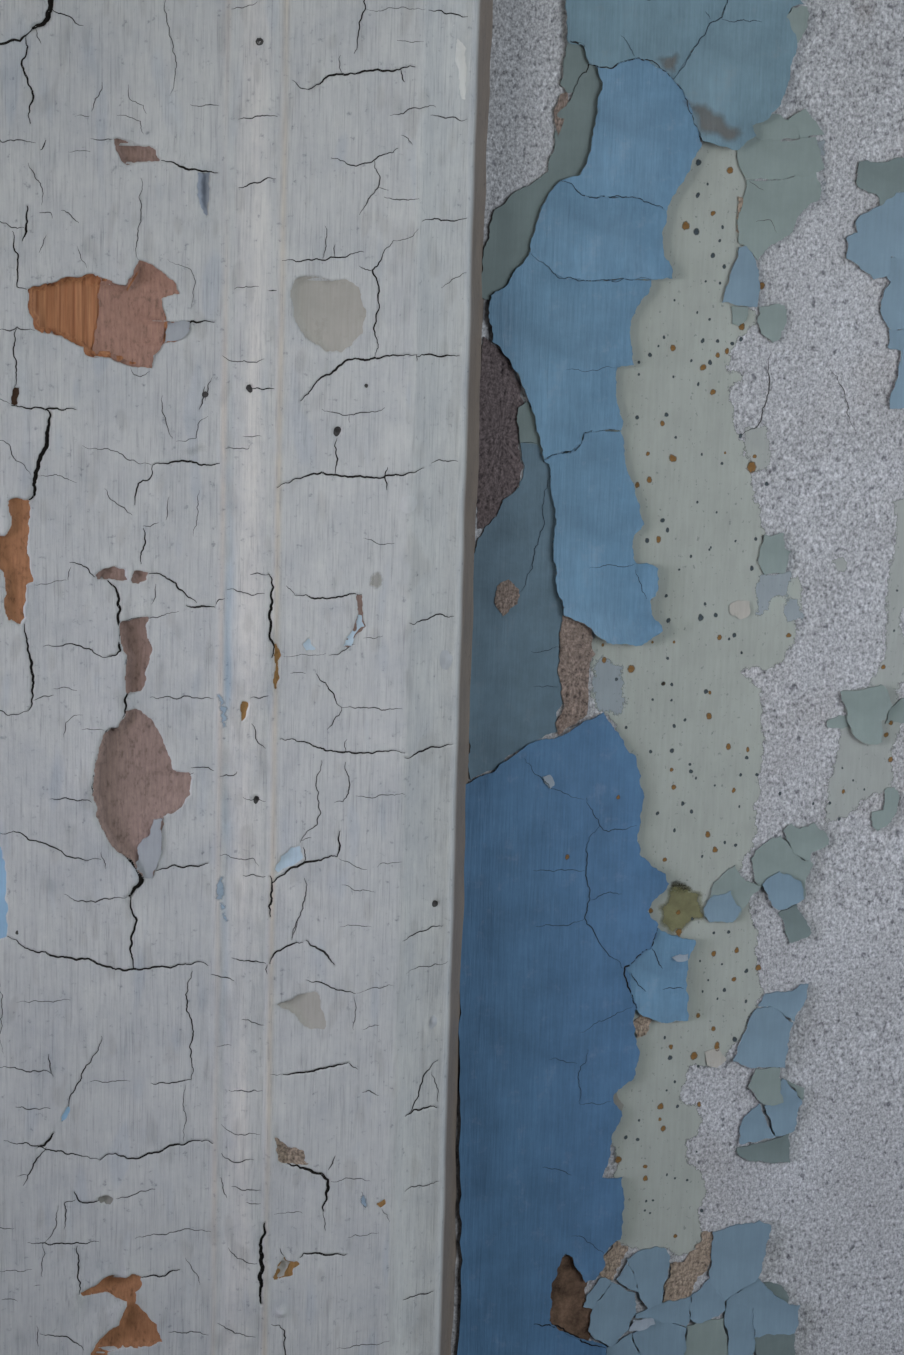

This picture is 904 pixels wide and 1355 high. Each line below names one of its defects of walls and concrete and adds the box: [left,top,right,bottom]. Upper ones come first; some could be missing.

peeling [114,138,160,165]
peeling [28,260,190,368]
peeling [0,498,33,624]
peeling [119,617,152,694]
crack [0,0,468,1355]
peeling [457,0,904,1355]
peeling [92,709,192,878]
peeling [0,847,18,939]
peeling [275,1138,308,1165]
peeling [81,1274,162,1355]